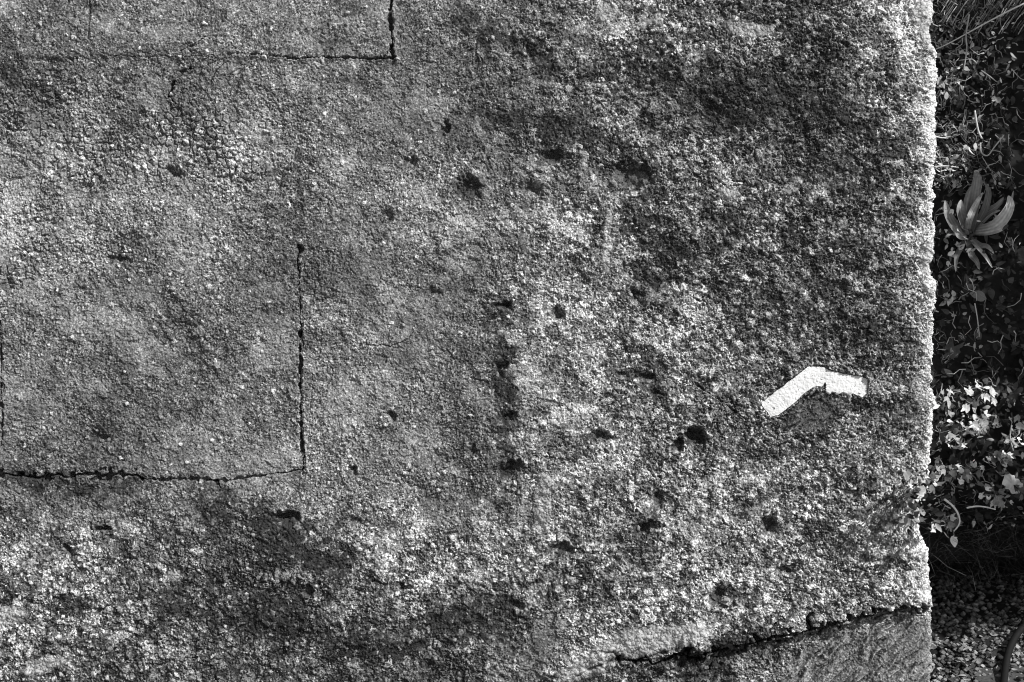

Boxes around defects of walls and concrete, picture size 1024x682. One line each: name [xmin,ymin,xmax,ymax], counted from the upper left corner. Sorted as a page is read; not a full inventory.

crack [345,1,394,60]
crack [297,307,305,468]
crack [585,605,925,668]